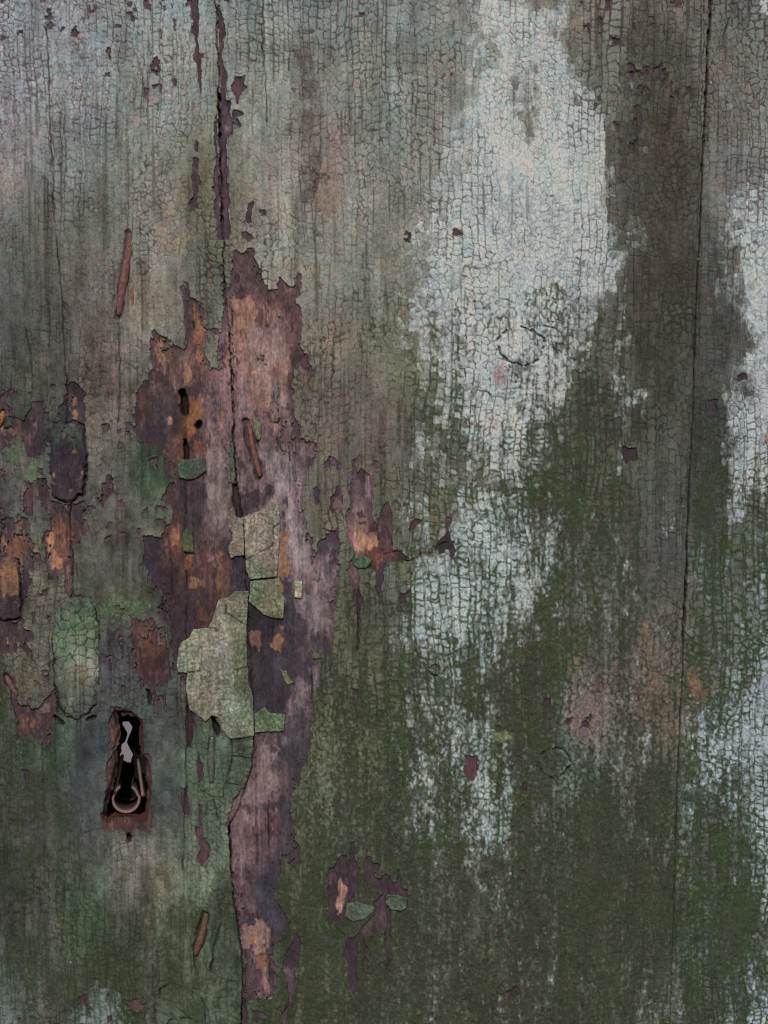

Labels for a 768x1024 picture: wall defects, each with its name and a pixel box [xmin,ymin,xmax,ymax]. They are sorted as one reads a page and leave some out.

peeling [0,0,409,1024]
peeling [437,517,461,560]
leakage [390,0,647,866]
leakage [620,731,652,775]
leakage [679,563,768,924]
leakage [737,935,768,1024]